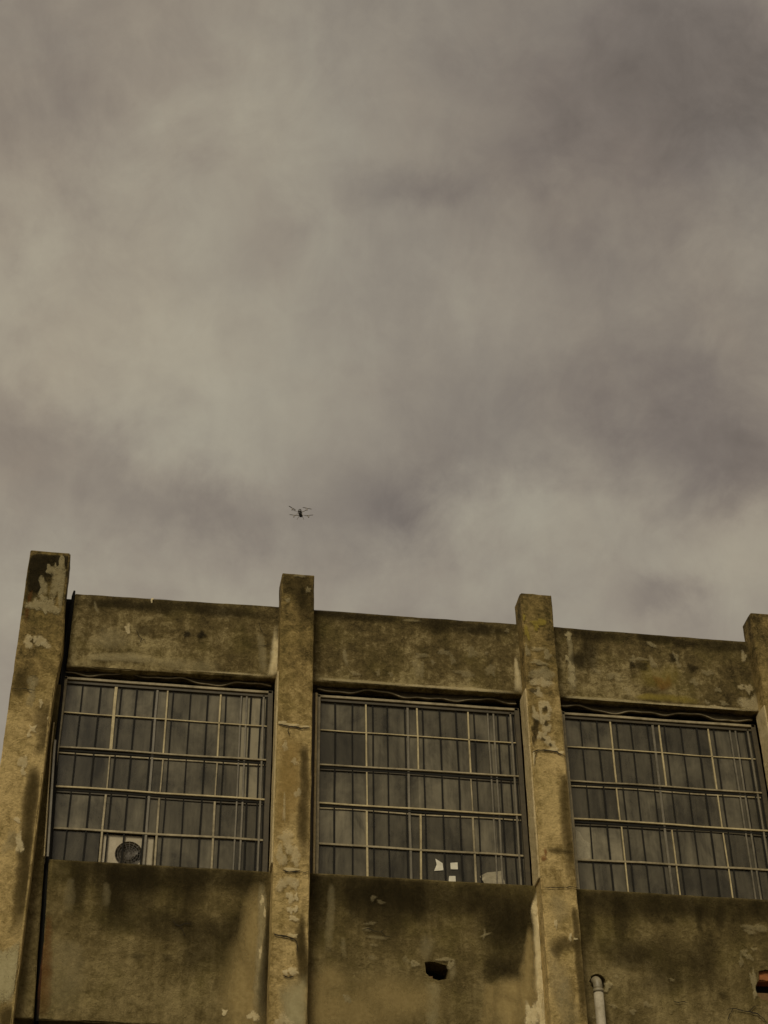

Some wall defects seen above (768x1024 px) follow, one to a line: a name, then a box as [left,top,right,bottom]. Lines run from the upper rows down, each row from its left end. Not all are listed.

flaking render [25,555,66,614]
flaking render [24,635,50,648]
flaking render [531,706,553,746]
water stain [16,771,39,914]
water stain [222,894,266,1024]
water stain [297,920,436,1024]
water stain [484,897,546,1024]
water stain [573,912,585,1003]